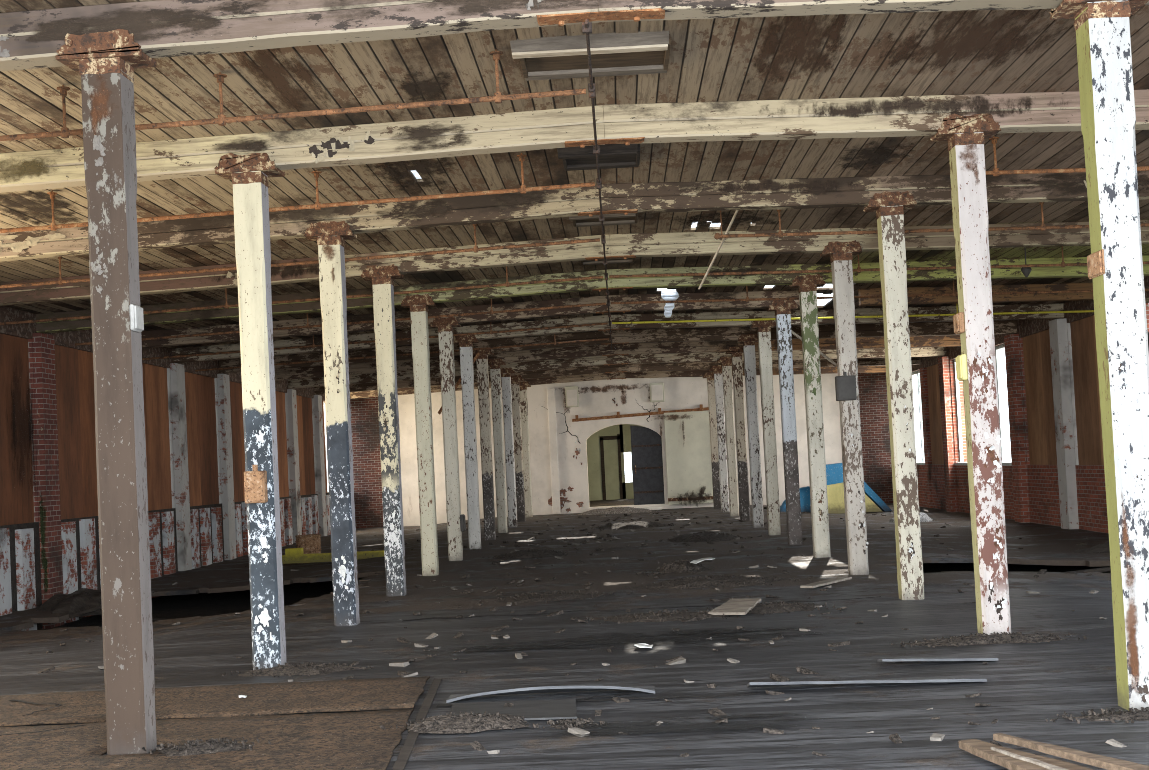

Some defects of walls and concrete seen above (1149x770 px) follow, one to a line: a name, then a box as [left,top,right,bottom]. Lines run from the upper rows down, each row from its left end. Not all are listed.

leakage [877,10,1064,73]
peeling [93,135,106,190]
leakage [0,159,80,224]
peeling [91,247,106,294]
peeling [973,345,993,393]
peeling [984,432,1002,484]
peeling [258,536,270,563]
peeling [335,555,348,589]
peeling [993,527,1003,559]
peeling [254,604,273,641]
peeling [988,582,1007,620]